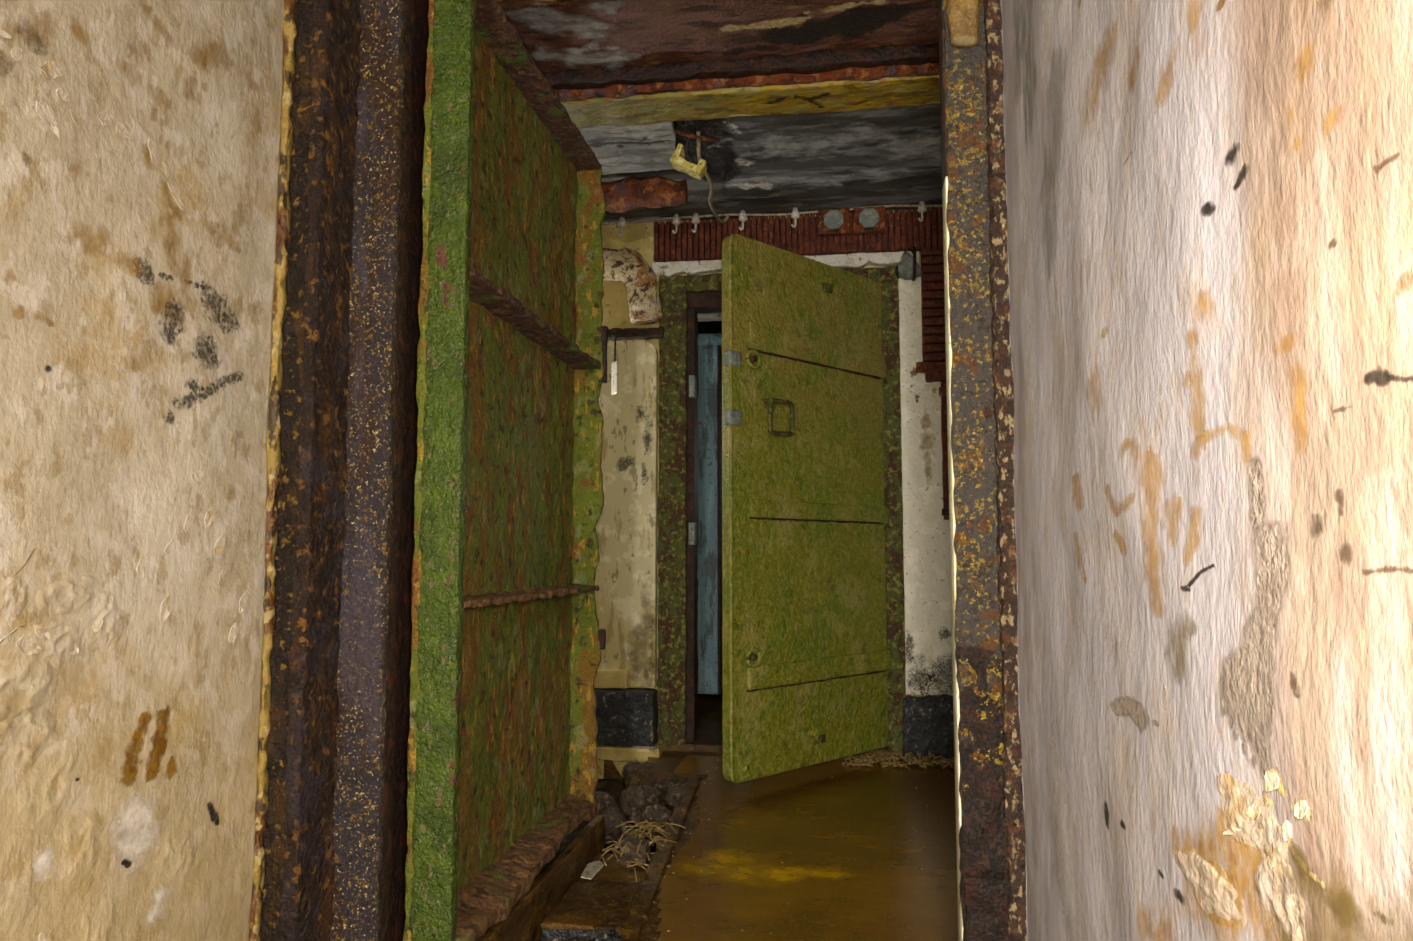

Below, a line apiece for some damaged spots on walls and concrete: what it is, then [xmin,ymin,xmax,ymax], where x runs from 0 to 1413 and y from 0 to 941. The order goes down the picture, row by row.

peeling [517,0,630,67]
peeling [720,0,928,56]
spalling [674,119,739,183]
mould [133,259,242,424]
mould [904,634,953,697]
rust [122,706,177,785]
rust [955,646,1012,941]